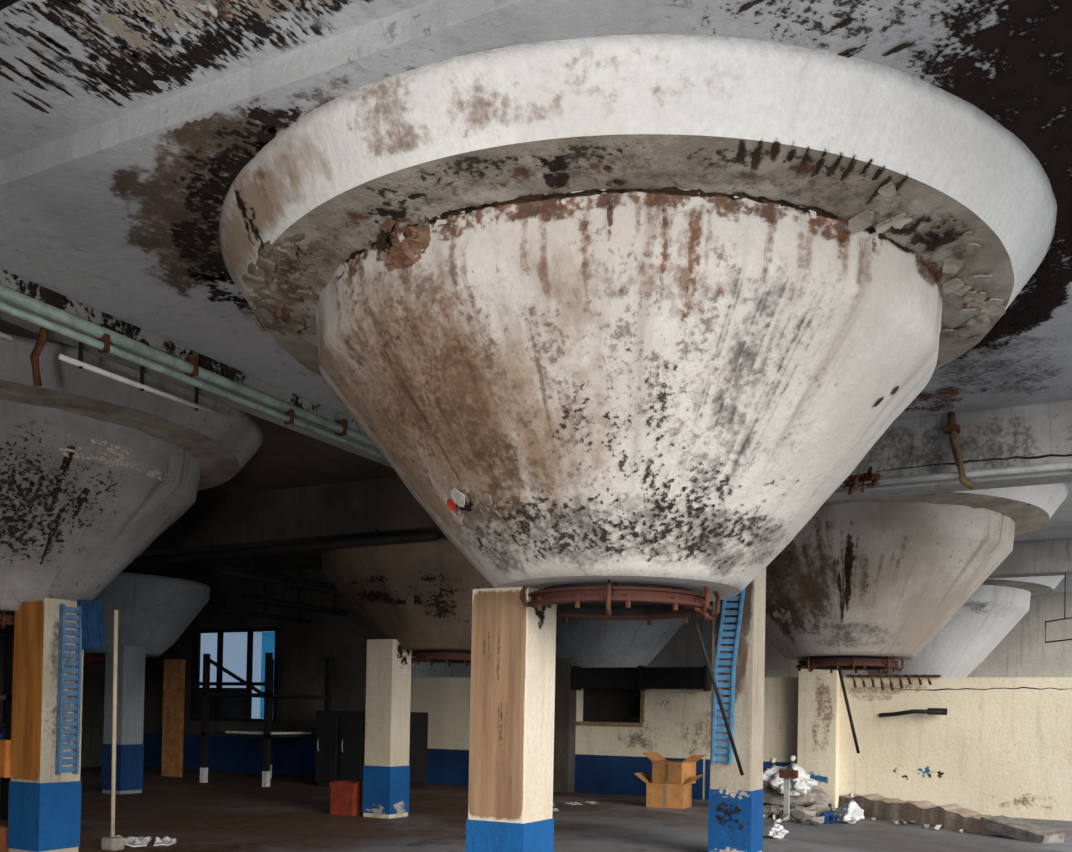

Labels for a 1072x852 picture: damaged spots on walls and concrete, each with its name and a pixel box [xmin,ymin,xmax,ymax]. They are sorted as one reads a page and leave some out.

crack [347,242,376,263]
corrosion [337,244,390,293]
corrosion [345,193,427,235]
crack [411,187,838,226]
corrosion [403,156,850,321]
crack [866,227,915,254]
corrosion [867,211,967,286]
water stain [940,233,1072,389]
water stain [319,288,792,574]
water stain [0,430,171,565]
water stain [351,573,526,820]
peeling [716,787,750,829]